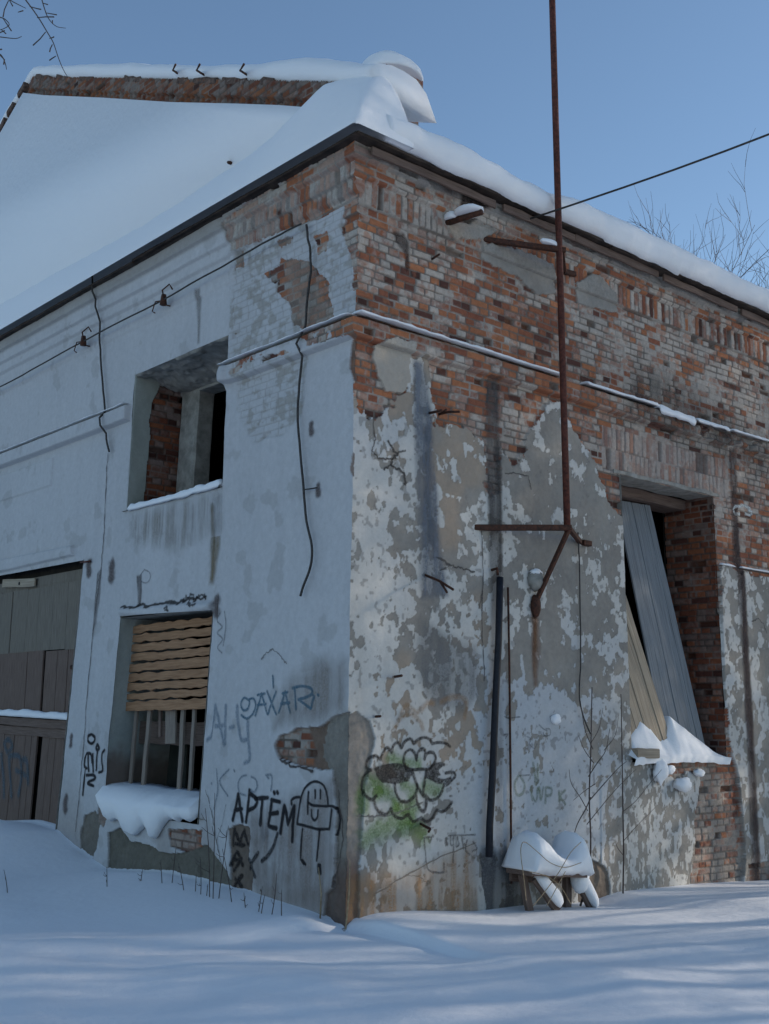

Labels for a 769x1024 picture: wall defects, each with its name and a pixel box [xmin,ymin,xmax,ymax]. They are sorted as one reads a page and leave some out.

crack [371,415,407,486]
damp [415,361,446,595]
flaking render [228,193,769,927]
flaking render [80,808,254,891]